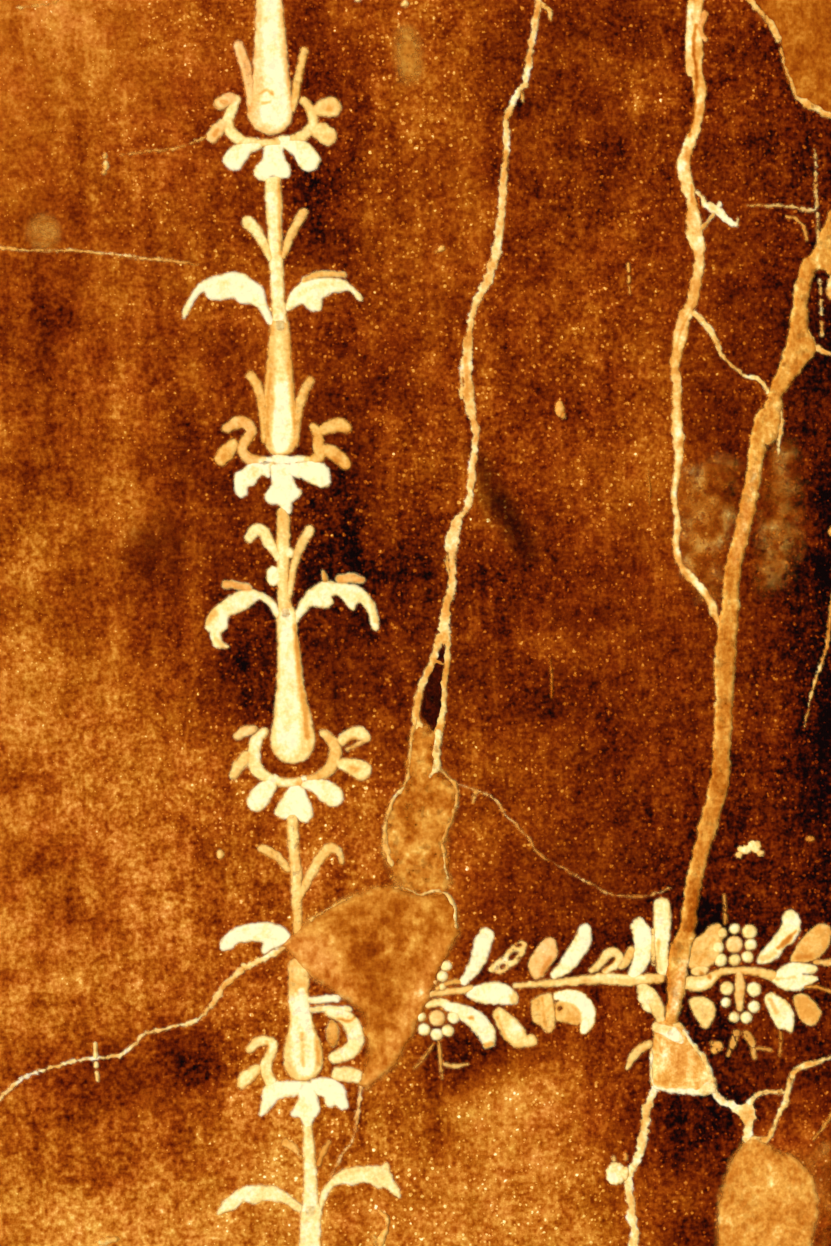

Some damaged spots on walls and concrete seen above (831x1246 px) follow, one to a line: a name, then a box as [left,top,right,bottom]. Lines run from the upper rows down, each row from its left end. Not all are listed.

crack [129,136,207,155]
crack [0,246,193,265]
crack [412,0,552,736]
crack [459,0,831,1025]
crack [0,947,285,1101]
crack [624,1086,659,1246]
peeling [718,1139,819,1246]
crack [713,1057,831,1143]